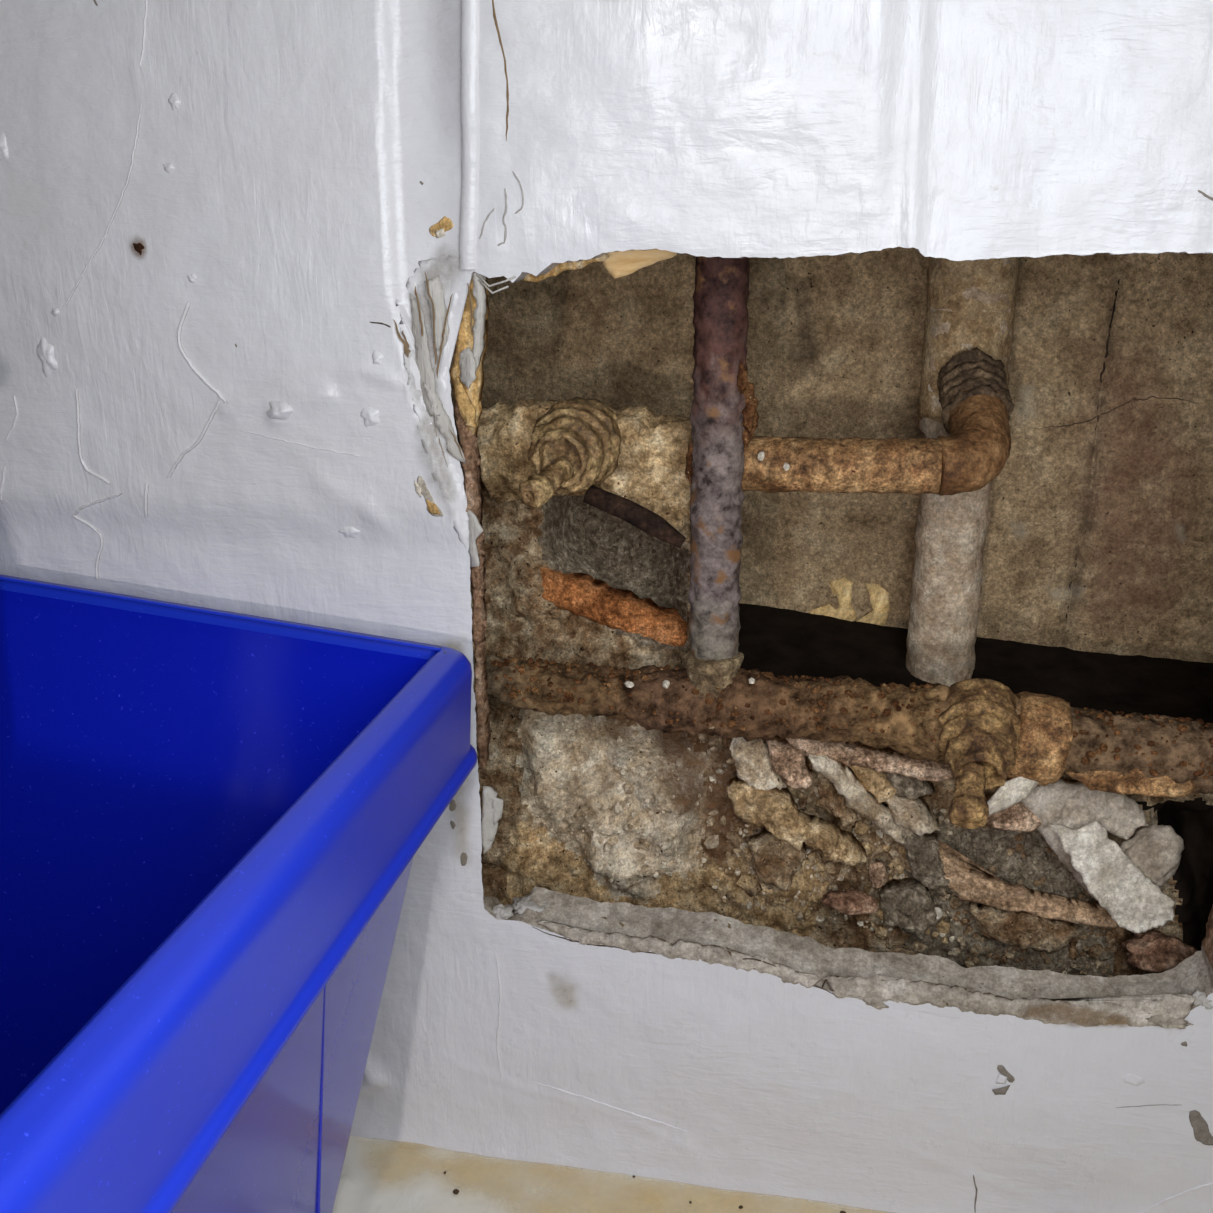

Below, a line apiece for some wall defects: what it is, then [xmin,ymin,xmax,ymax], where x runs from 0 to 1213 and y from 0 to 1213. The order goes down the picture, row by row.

corrosion [737,361,759,448]
corrosion [685,442,693,485]
peeling [393,255,516,770]
peeling [481,786,504,853]
corrosion [659,730,738,859]
peeling [987,777,1039,816]
corrosion [1066,768,1197,798]
flaking render [491,894,1213,1047]
leakage [377,1142,839,1213]